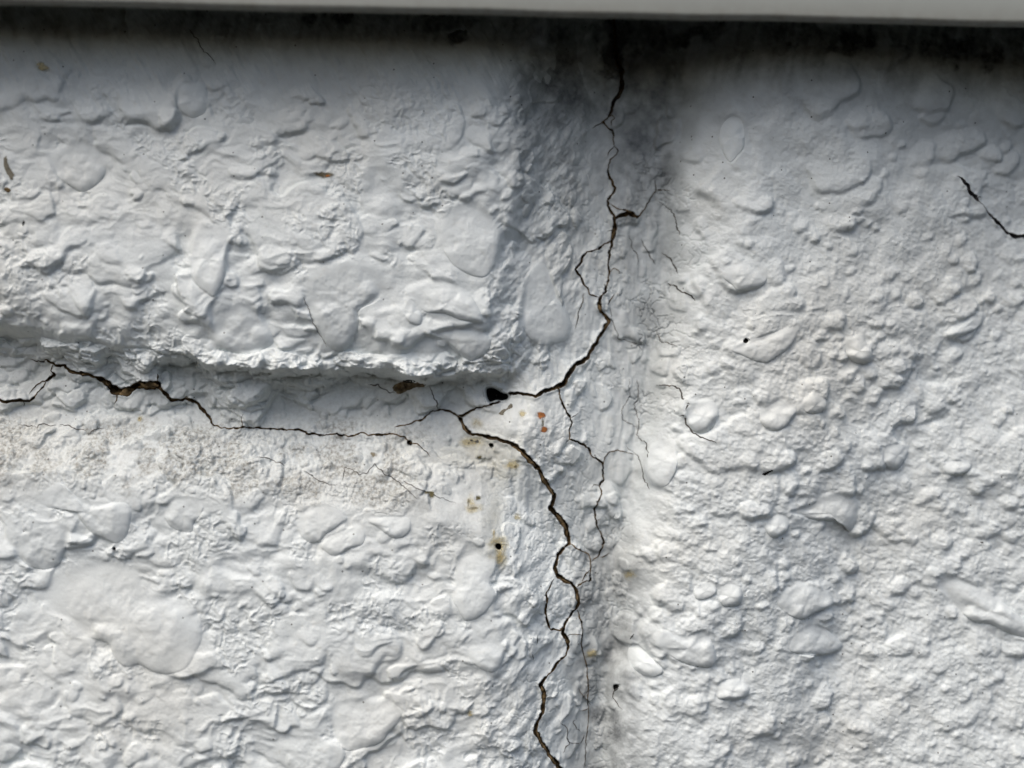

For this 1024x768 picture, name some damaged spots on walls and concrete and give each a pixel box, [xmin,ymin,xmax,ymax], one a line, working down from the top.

crack [0,19,716,768]
crack [958,176,1024,239]